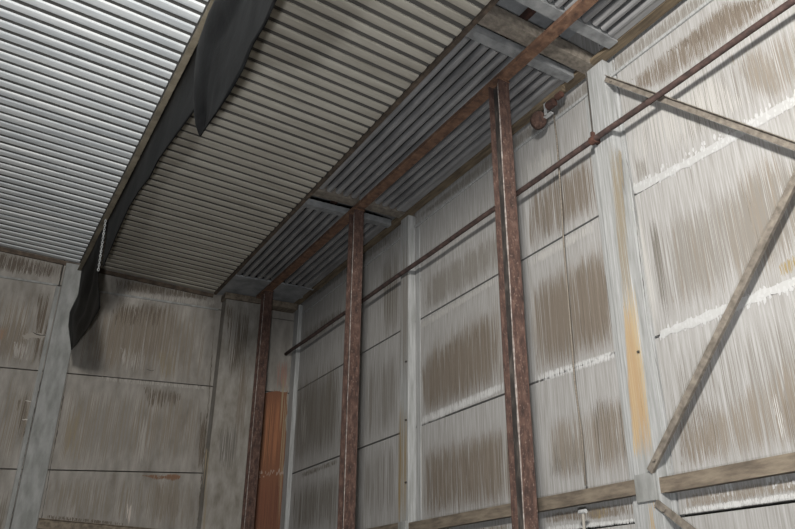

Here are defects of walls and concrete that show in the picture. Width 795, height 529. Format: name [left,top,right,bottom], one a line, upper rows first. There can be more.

corrosion [254,391,288,529]
water stain [416,83,525,529]
water stain [526,147,615,384]
corrosion [621,278,654,463]
water stain [609,0,795,468]